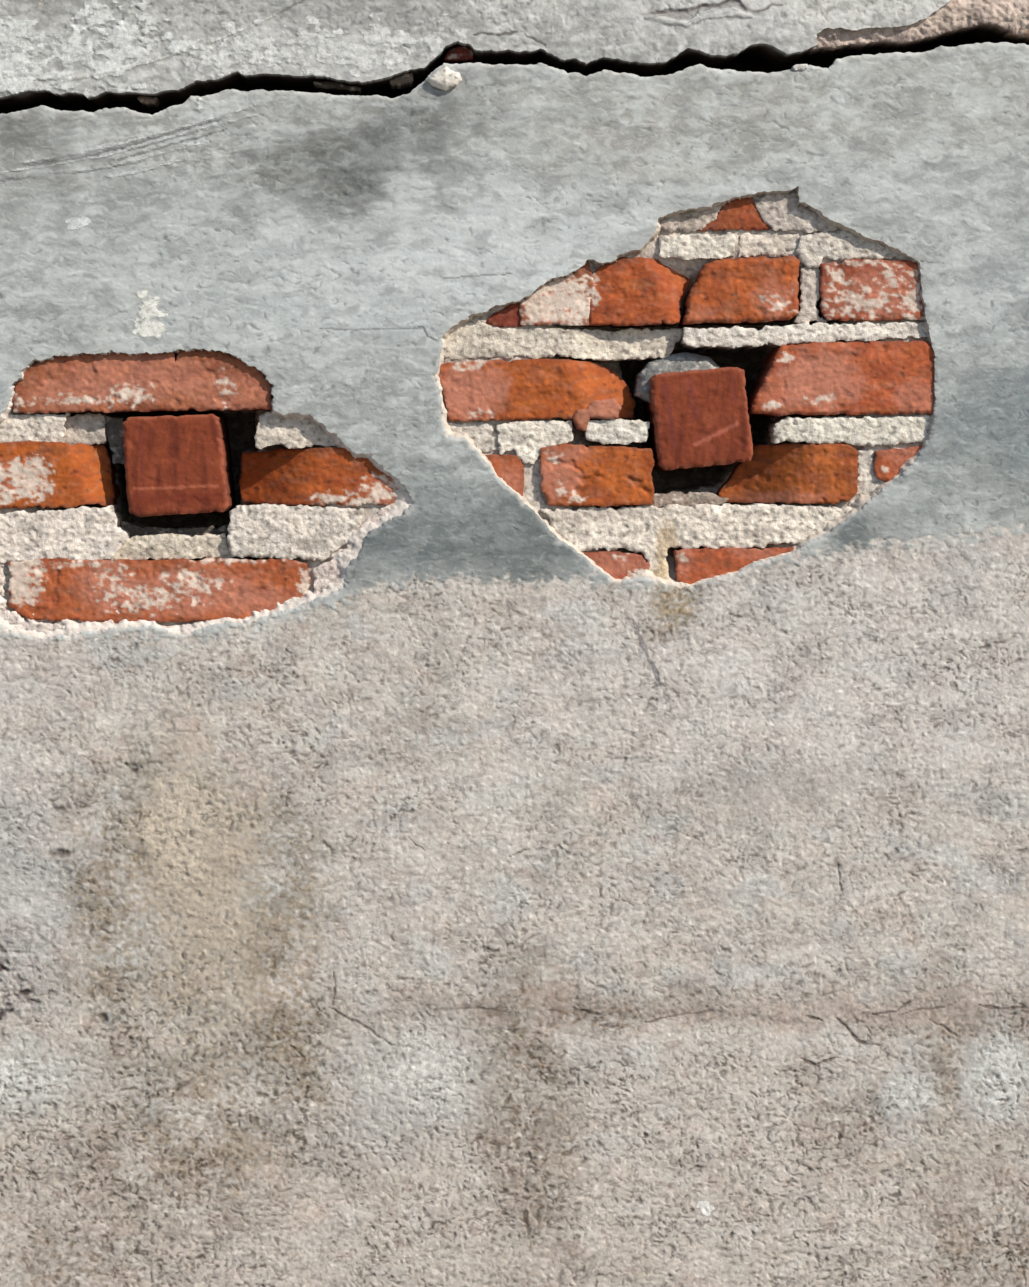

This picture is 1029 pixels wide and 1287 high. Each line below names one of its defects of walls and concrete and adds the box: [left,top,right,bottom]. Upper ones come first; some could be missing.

crack [0,28,1029,115]
flaking render [805,0,1029,56]
flaking render [0,288,413,639]
flaking render [434,187,935,589]